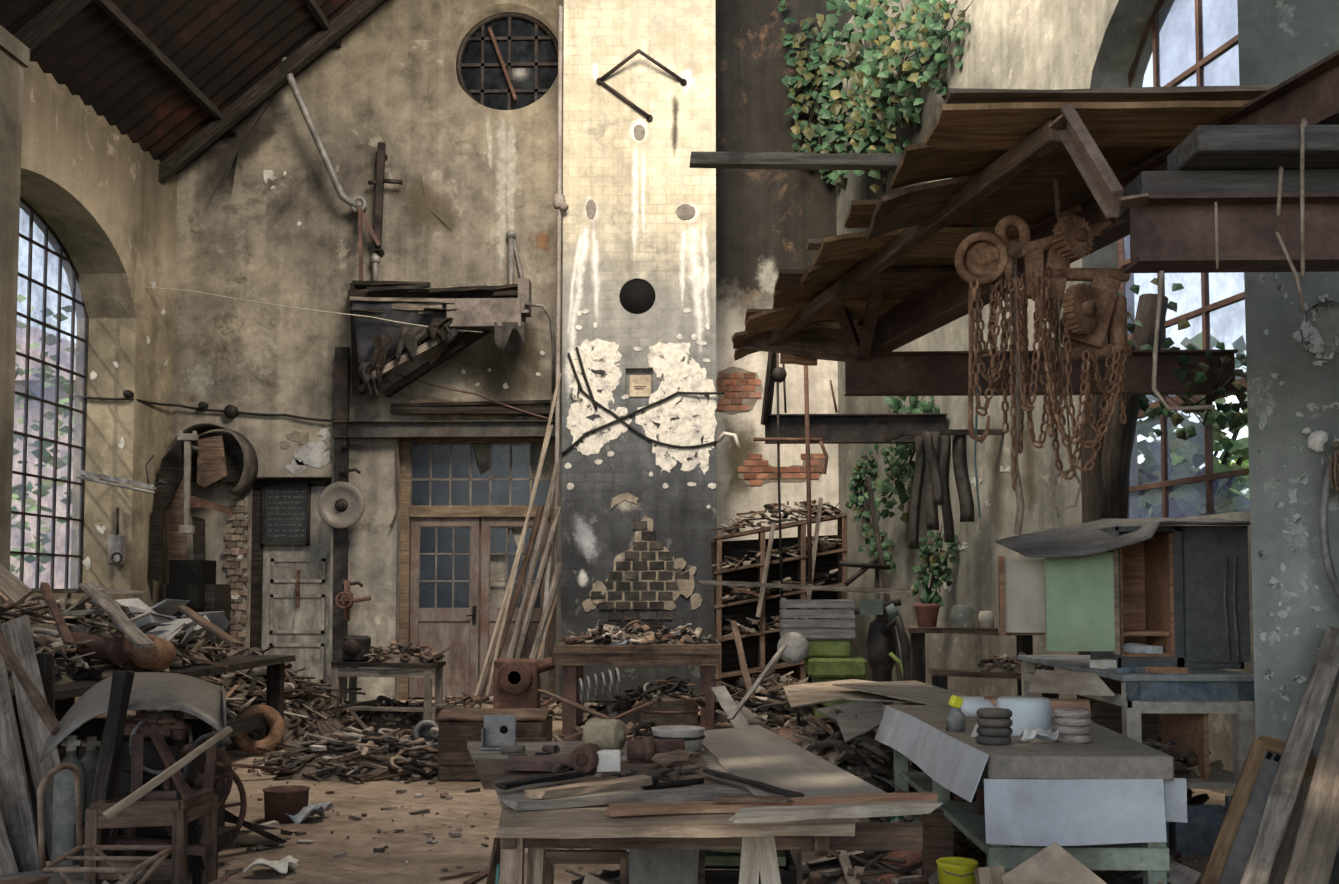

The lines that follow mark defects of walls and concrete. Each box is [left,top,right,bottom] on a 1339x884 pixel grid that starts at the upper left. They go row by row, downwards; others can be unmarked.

water stain [631,121,645,247]
water stain [566,199,599,384]
water stain [676,204,708,340]
spalling [1252,274,1339,367]
peeling [565,309,763,490]
spalling [737,453,825,486]
spalling [582,516,702,630]